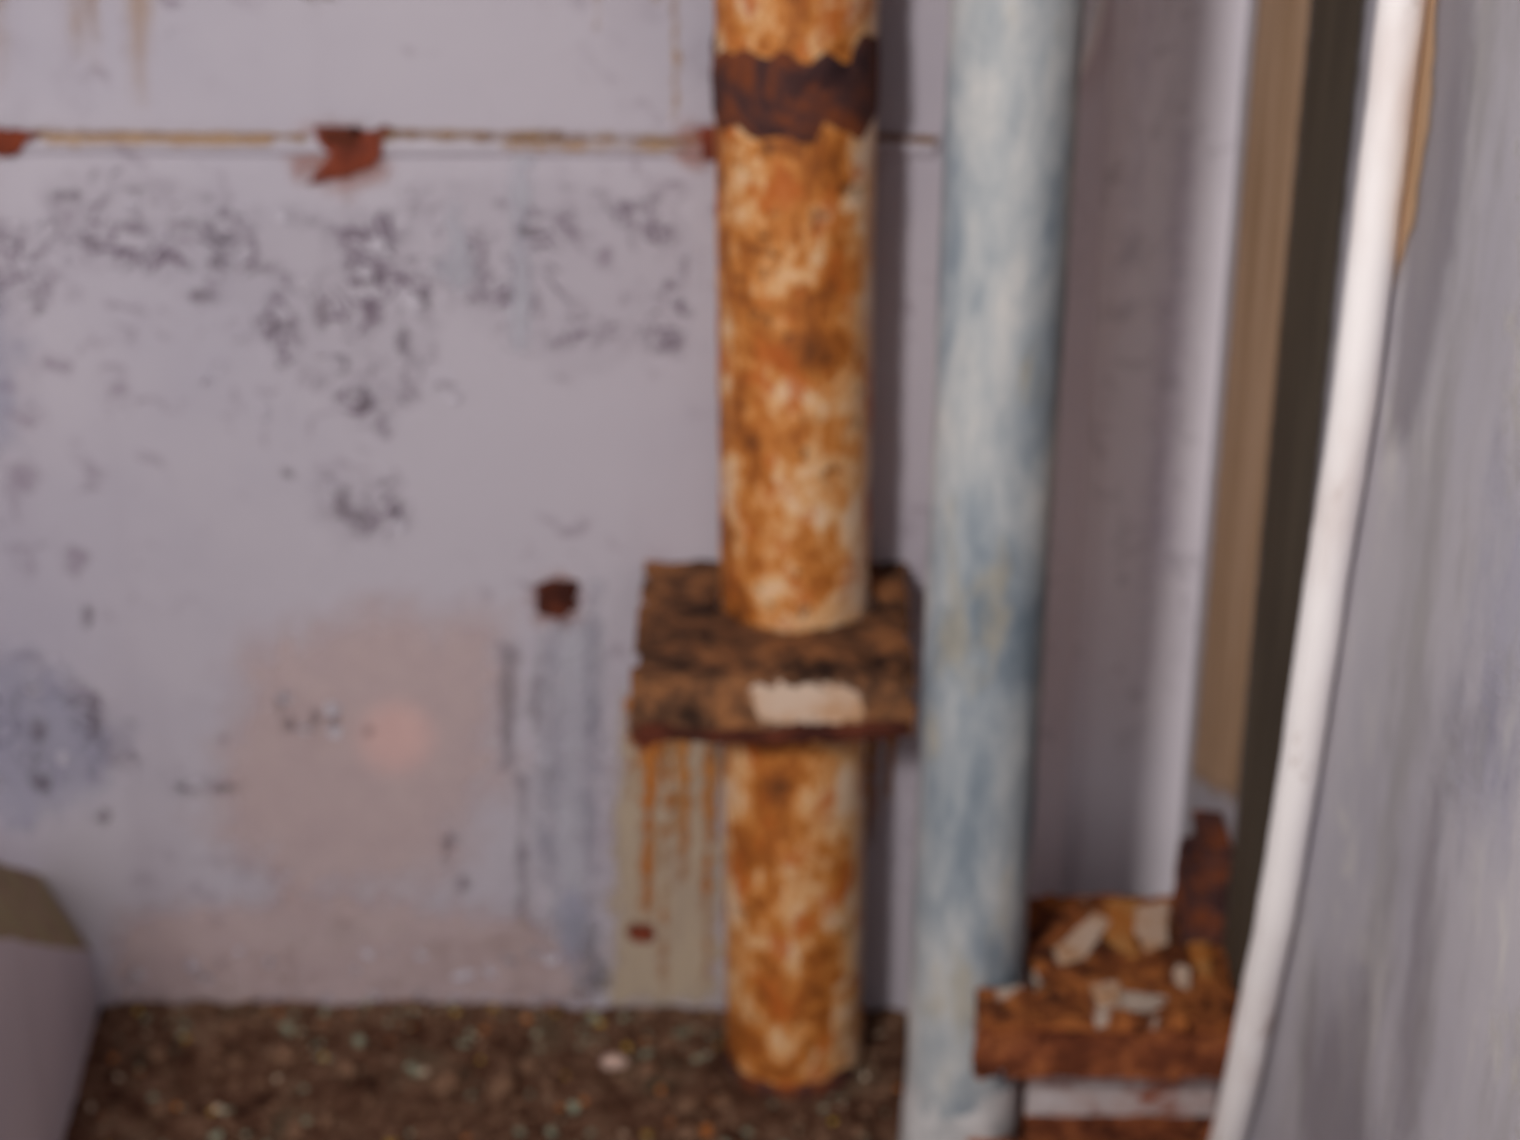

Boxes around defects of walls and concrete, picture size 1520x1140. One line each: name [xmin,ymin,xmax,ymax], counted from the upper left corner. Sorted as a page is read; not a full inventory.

corrosion [30,130,305,146]
corrosion [376,129,616,150]
corrosion [610,696,911,1003]
corrosion [1104,898,1141,959]